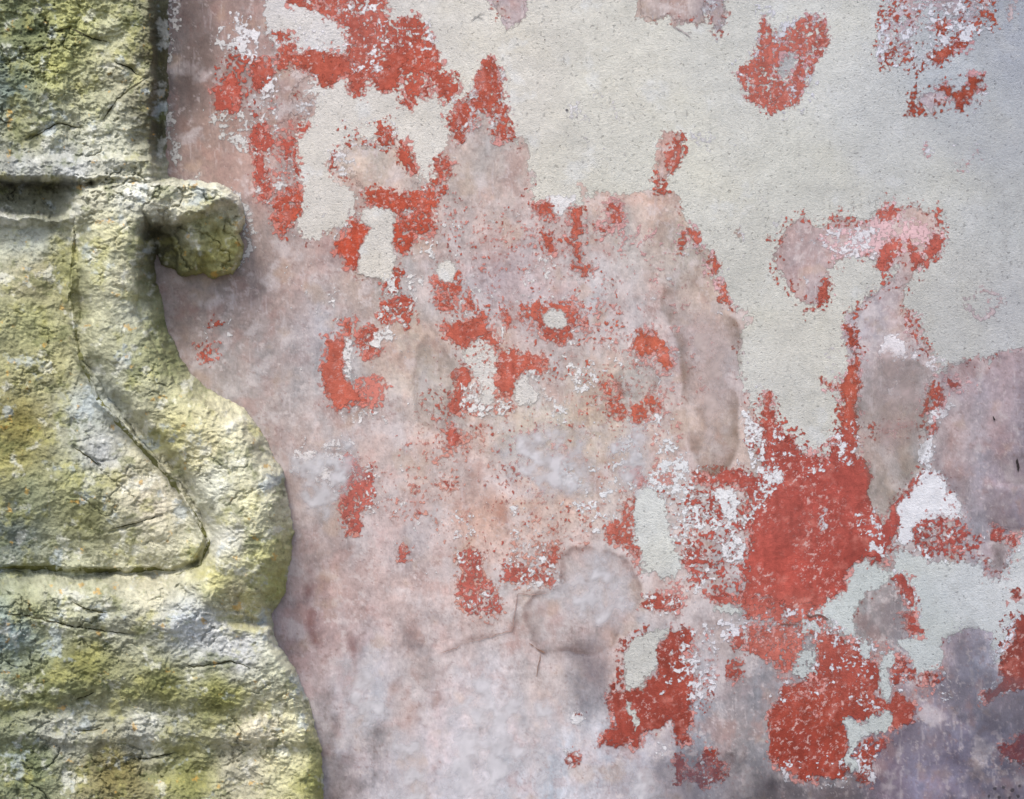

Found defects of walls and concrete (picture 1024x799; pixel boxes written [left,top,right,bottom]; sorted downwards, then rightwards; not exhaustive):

spalling [167,0,182,65]
spalling [166,105,182,166]
flaking render [203,0,1024,791]
damp [572,557,623,624]
crack [441,593,546,677]